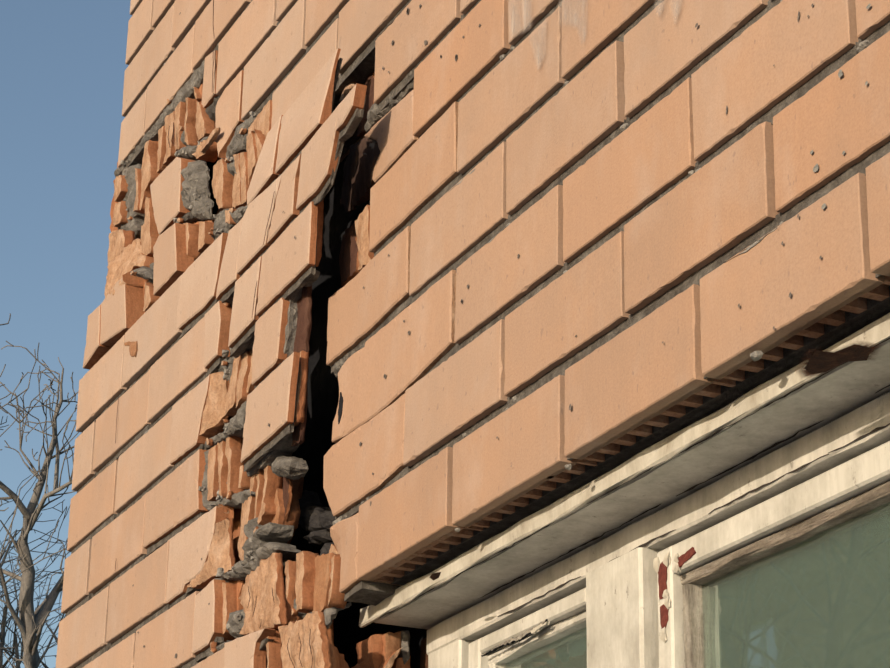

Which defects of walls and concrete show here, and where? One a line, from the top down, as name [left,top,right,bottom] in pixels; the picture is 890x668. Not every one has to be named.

spalling [83,50,272,370]
crack [205,160,218,217]
crack [290,63,564,668]
crack [677,362,847,455]
corrosion [799,342,878,377]
spalling [187,341,411,668]
crack [478,420,824,599]
crack [709,423,890,514]
crack [497,576,581,617]